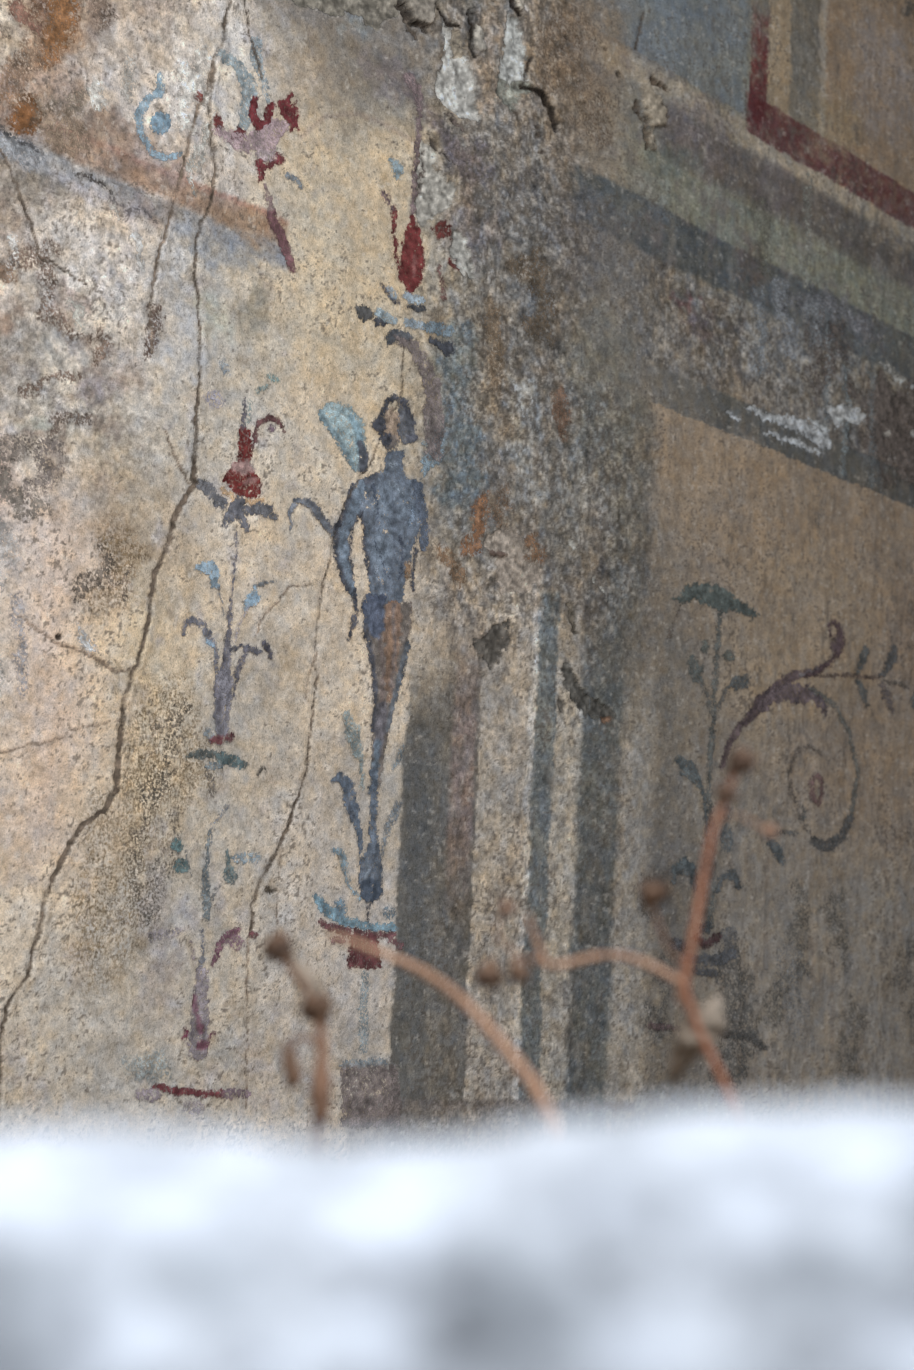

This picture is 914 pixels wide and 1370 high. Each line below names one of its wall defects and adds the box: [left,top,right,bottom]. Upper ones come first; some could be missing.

flaking render [435,0,530,131]
flaking render [632,76,668,150]
flaking render [414,134,456,226]
flaking render [449,231,475,279]
flaking render [879,360,914,389]
flaking render [726,404,866,456]
crack [0,0,262,1083]
crack [245,654,318,994]